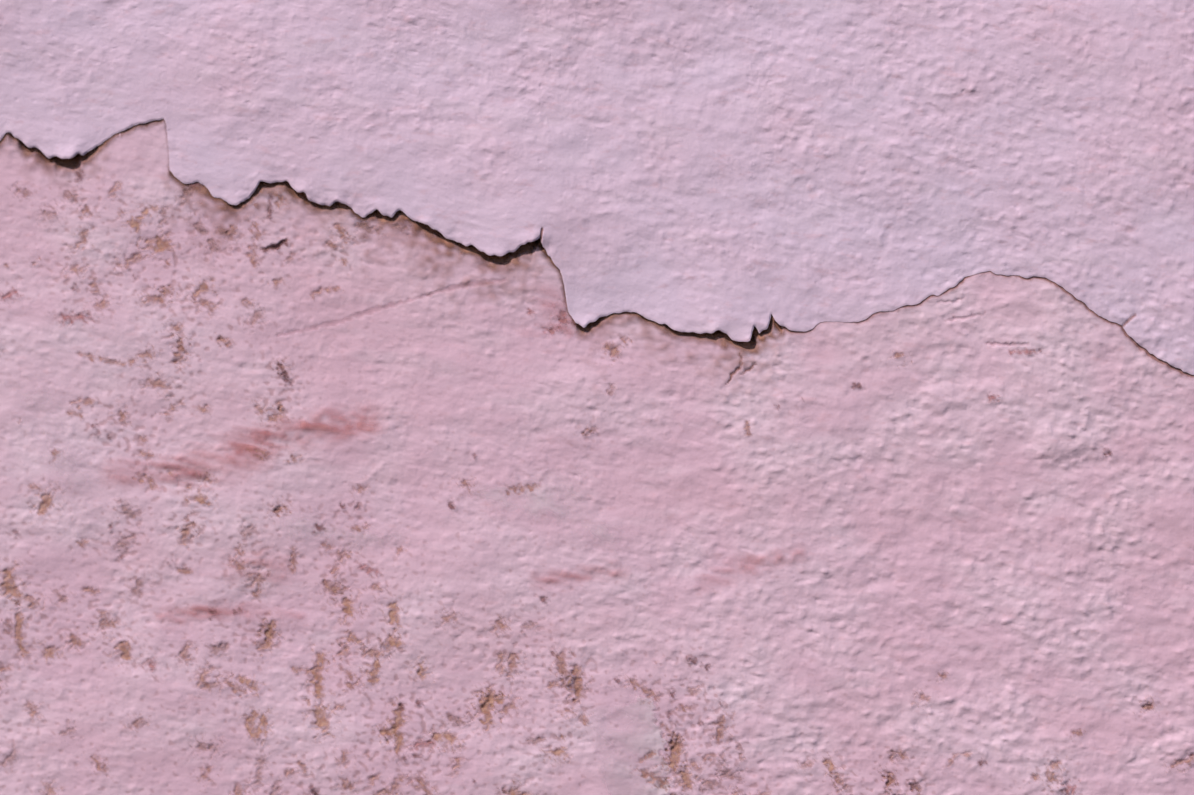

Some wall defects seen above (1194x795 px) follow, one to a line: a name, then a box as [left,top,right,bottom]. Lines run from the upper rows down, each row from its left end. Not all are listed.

peeling [0,109,806,342]
peeling [30,484,51,514]
peeling [316,524,353,617]
peeling [0,568,35,656]
peeling [115,642,130,660]
peeling [245,711,268,738]
peeling [292,653,344,735]
peeling [338,603,401,688]
peeling [380,700,464,760]
peeling [479,690,515,731]
peeling [548,651,582,711]
peeling [639,692,741,795]